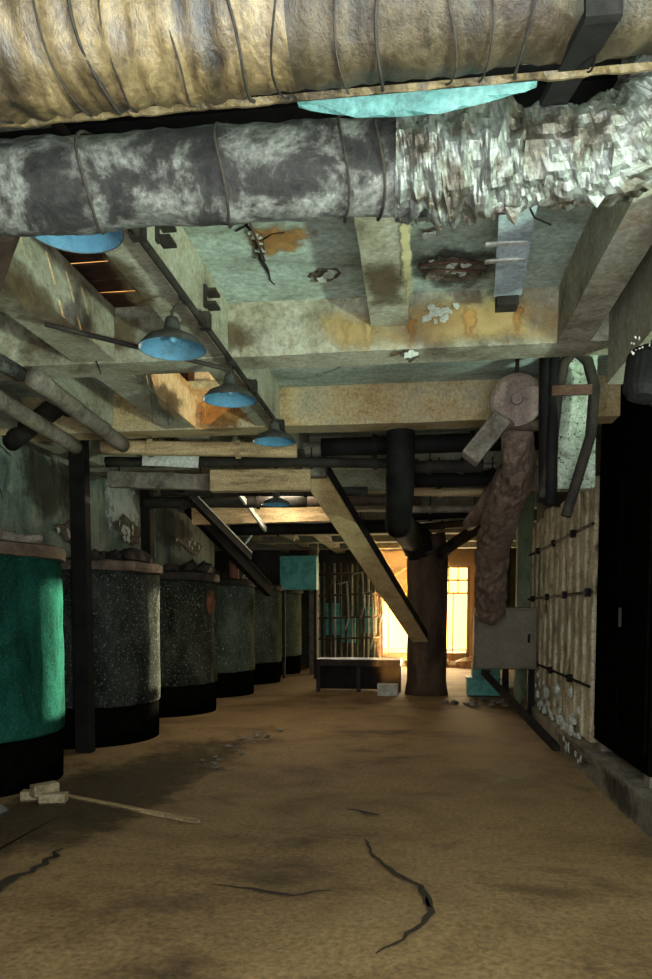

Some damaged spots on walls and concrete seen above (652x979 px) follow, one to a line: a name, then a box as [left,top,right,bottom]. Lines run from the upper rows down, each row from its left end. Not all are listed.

corrosion [255,226,310,256]
damp [399,224,494,296]
peeling [422,303,460,324]
crack [364,839,435,953]